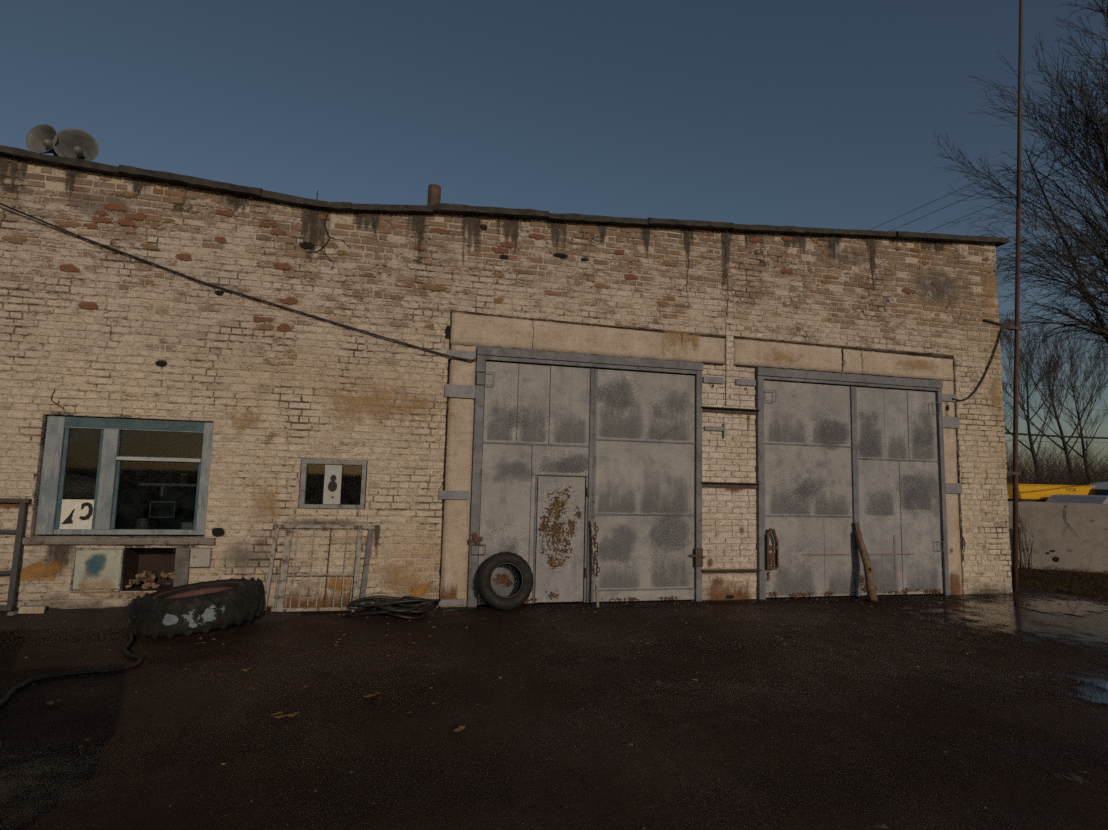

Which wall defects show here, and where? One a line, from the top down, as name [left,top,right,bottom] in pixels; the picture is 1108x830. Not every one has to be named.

damp [302,207,327,257]
damp [497,217,519,251]
damp [683,229,694,254]